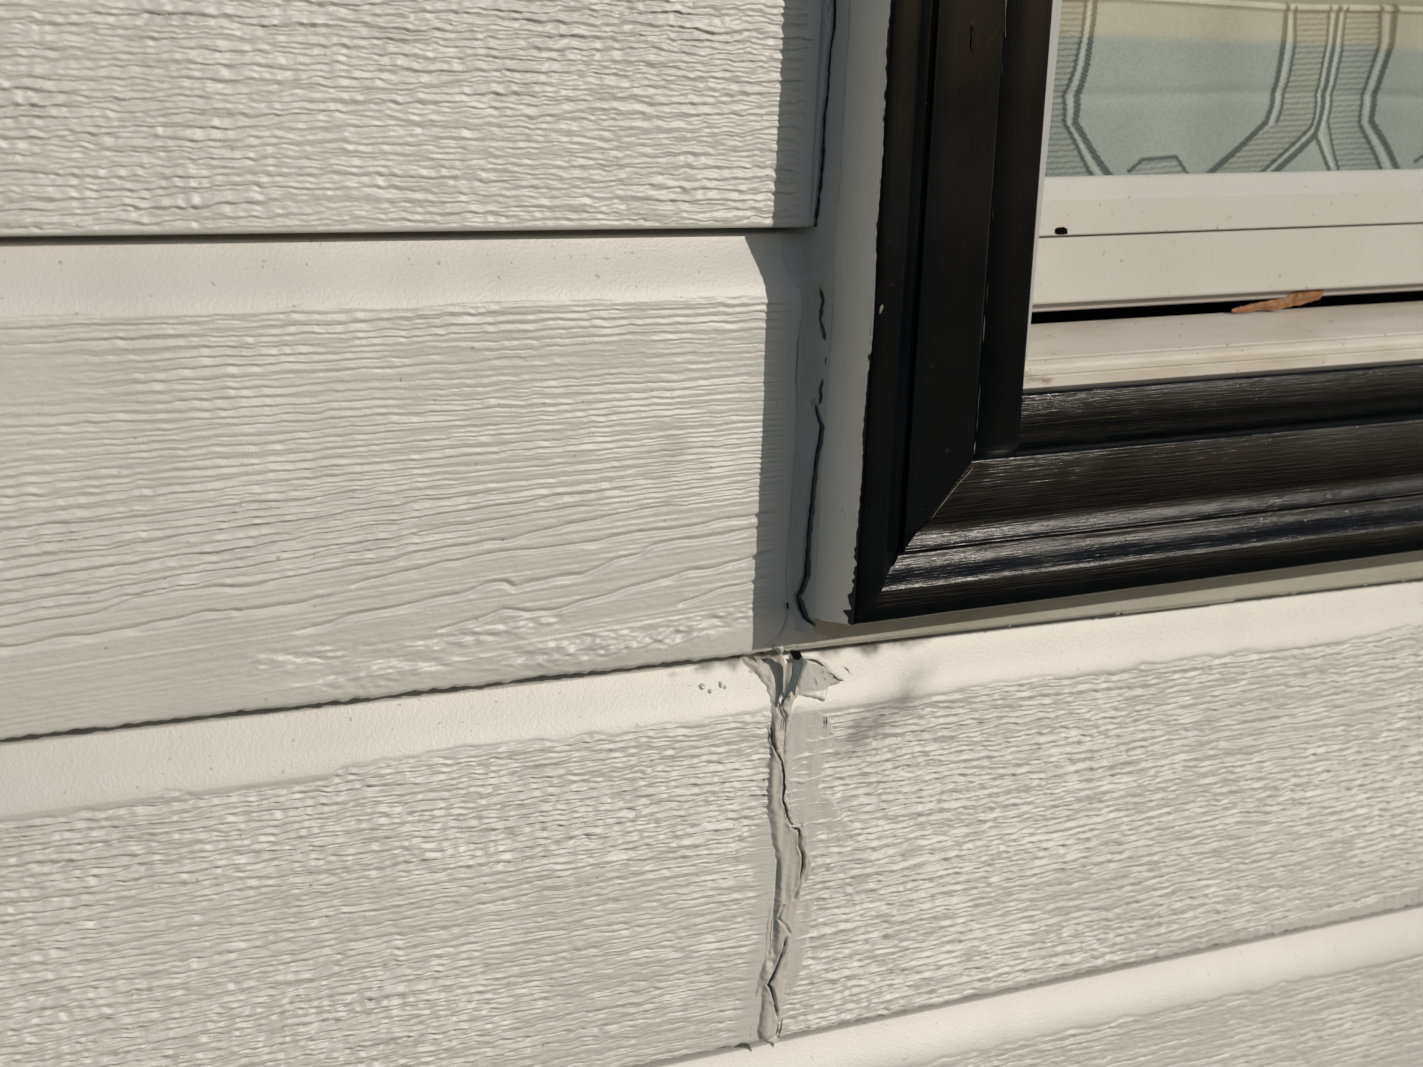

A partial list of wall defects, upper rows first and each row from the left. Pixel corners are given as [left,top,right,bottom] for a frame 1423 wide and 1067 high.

crack [796,287,827,626]
crack [771,701,804,879]
crack [767,907,790,1038]